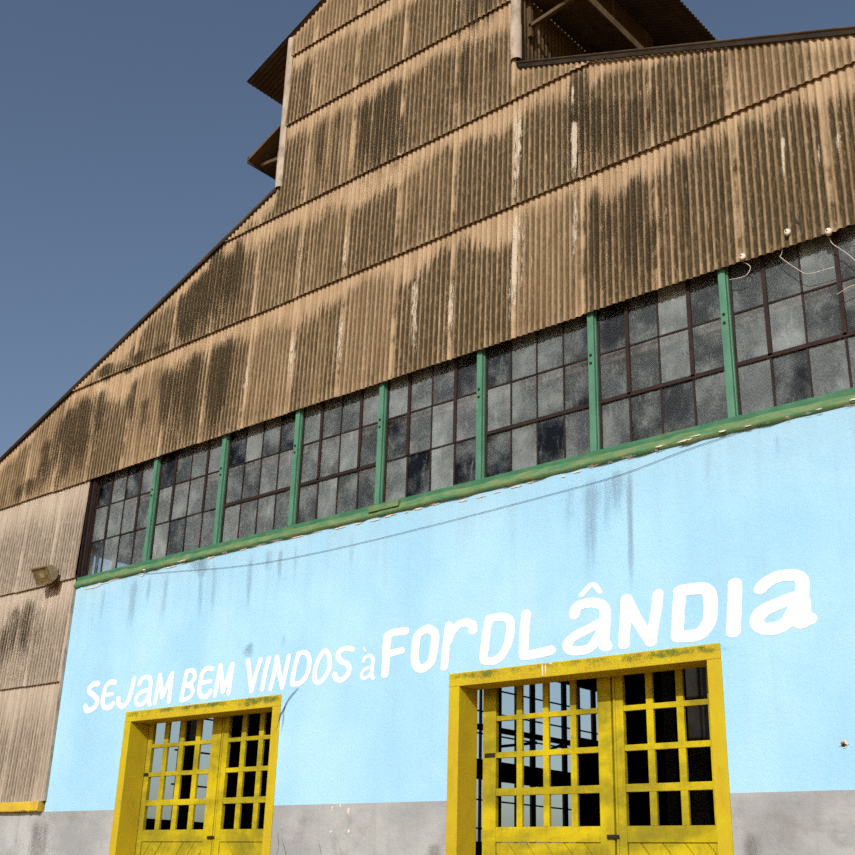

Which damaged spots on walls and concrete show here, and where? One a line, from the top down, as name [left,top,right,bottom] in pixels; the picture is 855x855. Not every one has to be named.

leakage [359,83,404,176]
leakage [460,48,469,99]
efflorescence [514,113,522,186]
leakage [569,67,655,170]
leakage [177,240,245,340]
efflorescence [509,215,524,304]
leakage [590,190,611,271]
leakage [622,174,656,272]
leakage [124,351,148,430]
leakage [159,340,232,433]
leakage [15,391,105,498]
leakage [0,603,42,657]